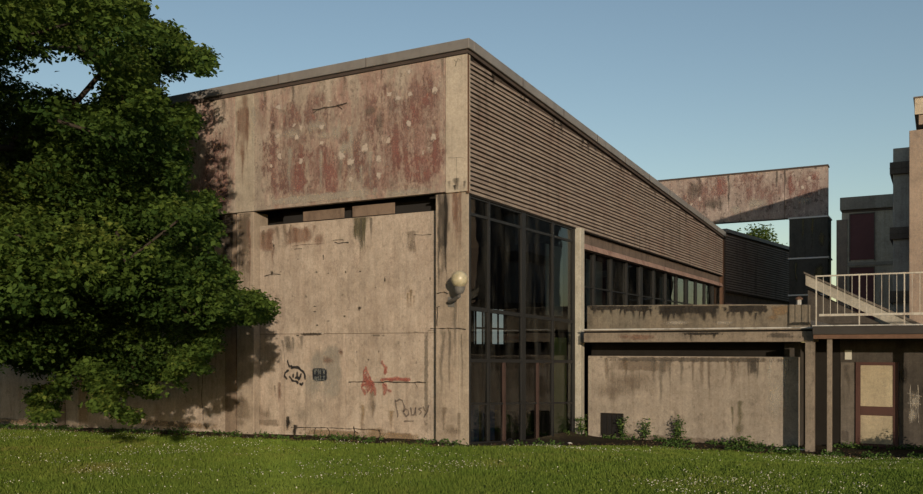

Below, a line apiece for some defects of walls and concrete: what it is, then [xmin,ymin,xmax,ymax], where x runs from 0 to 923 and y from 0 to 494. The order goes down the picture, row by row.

peeling [262,70,440,196]
leakage [589,305,767,337]